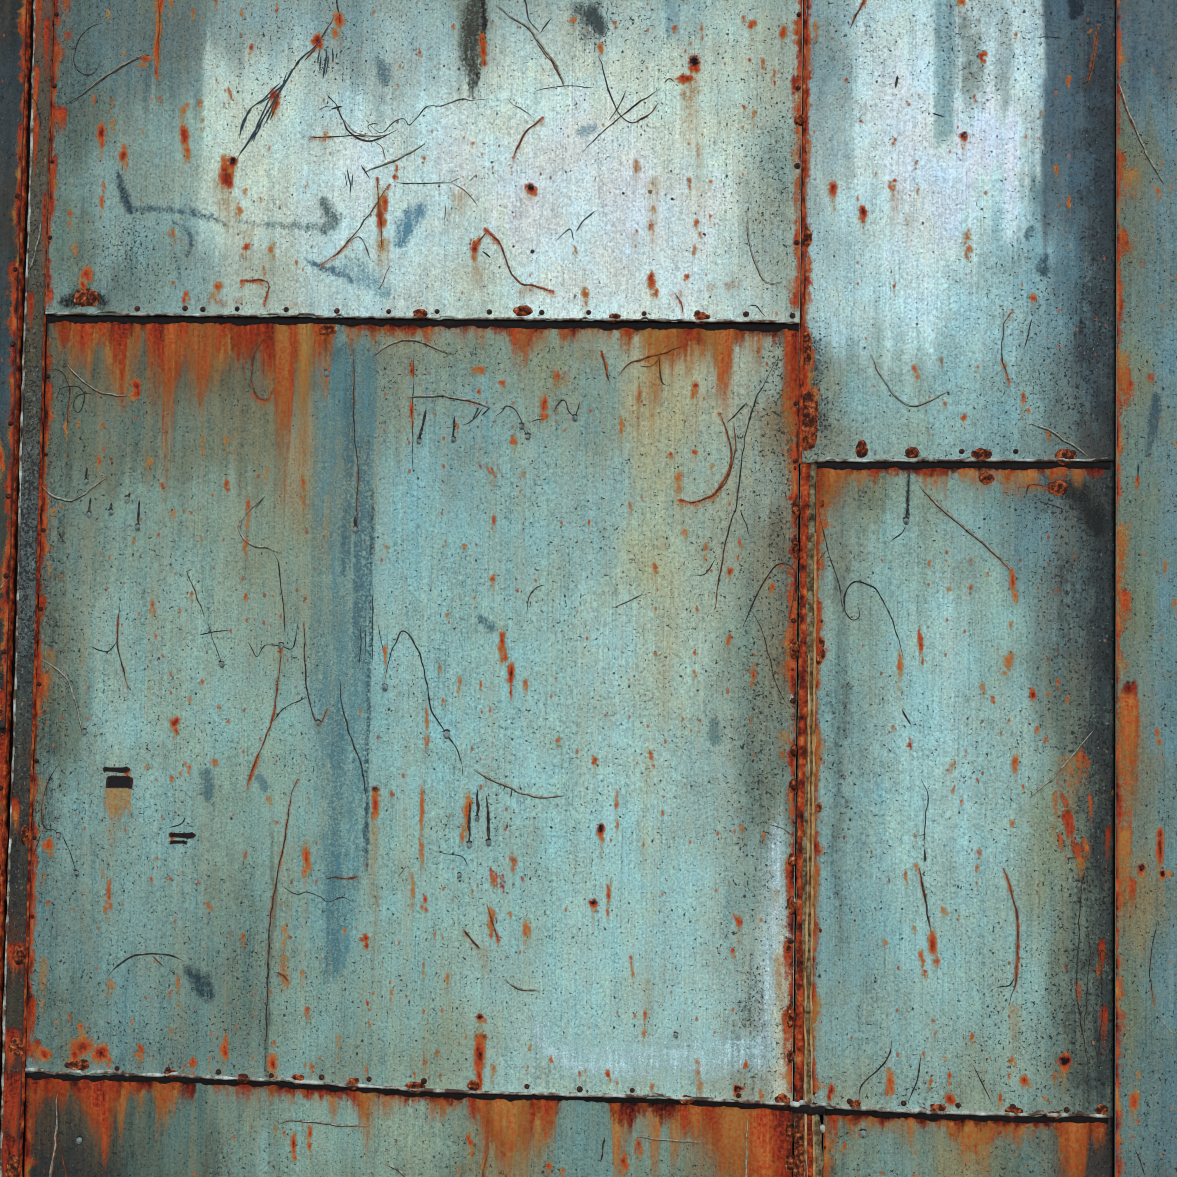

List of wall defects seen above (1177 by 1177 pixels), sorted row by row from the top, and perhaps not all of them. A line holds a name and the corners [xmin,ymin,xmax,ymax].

water stain [460,0,487,97]
water stain [1068,0,1086,19]
water stain [1036,254,1049,276]
corrosion [540,370,565,422]
water stain [309,338,376,981]
corrosion [267,1013,559,1177]